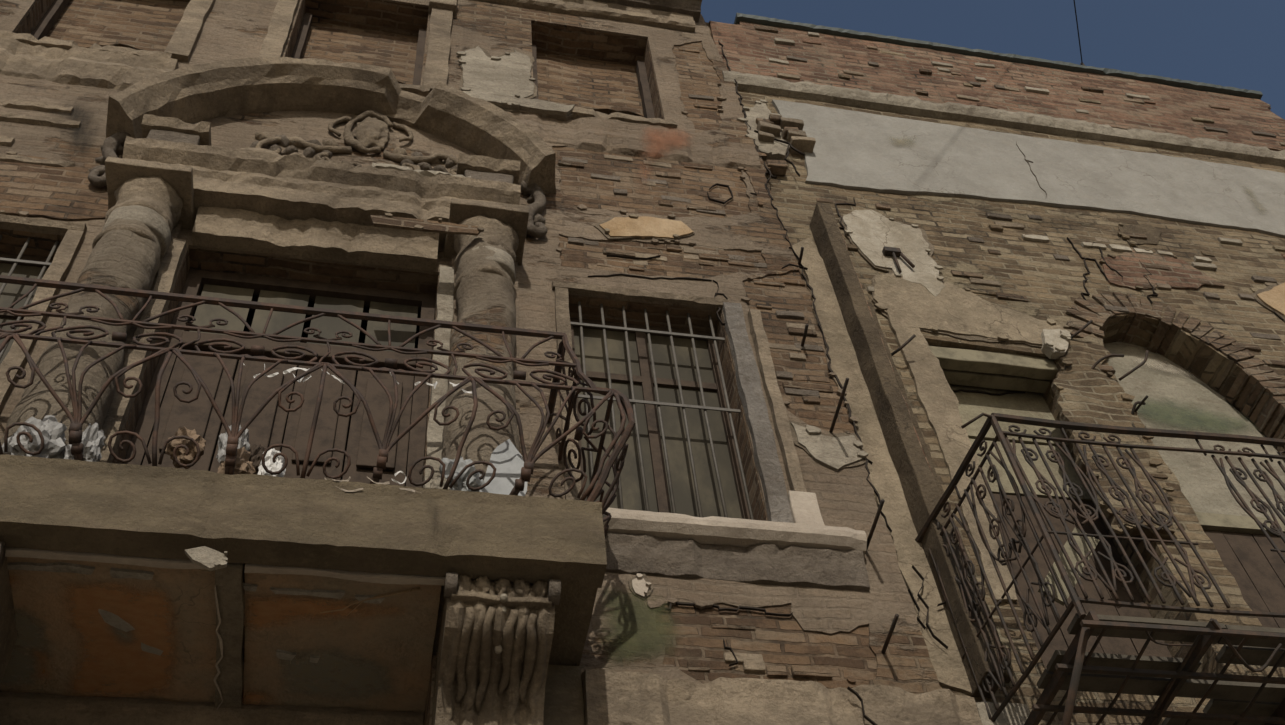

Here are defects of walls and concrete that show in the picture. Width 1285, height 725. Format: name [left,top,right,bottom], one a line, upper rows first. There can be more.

flaking render [456,45,575,121]
flaking render [552,99,790,241]
crack [1016,141,1047,196]
crack [1067,237,1158,304]
flaking render [1251,282,1285,323]
flaking render [741,272,868,471]
spalling [838,210,1177,540]
flaking render [628,573,877,685]
crack [908,565,948,649]
crack [847,686,877,725]